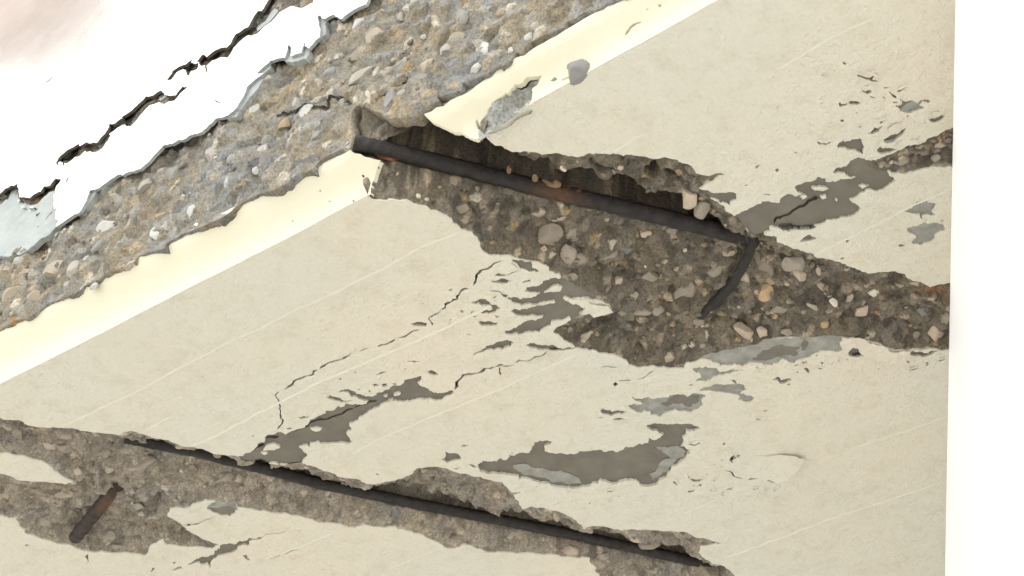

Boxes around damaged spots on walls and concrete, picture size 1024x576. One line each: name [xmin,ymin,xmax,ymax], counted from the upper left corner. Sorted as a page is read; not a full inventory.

crack [0,0,313,216]
spalling [0,0,953,420]
crack [252,357,377,452]
spalling [0,376,734,576]